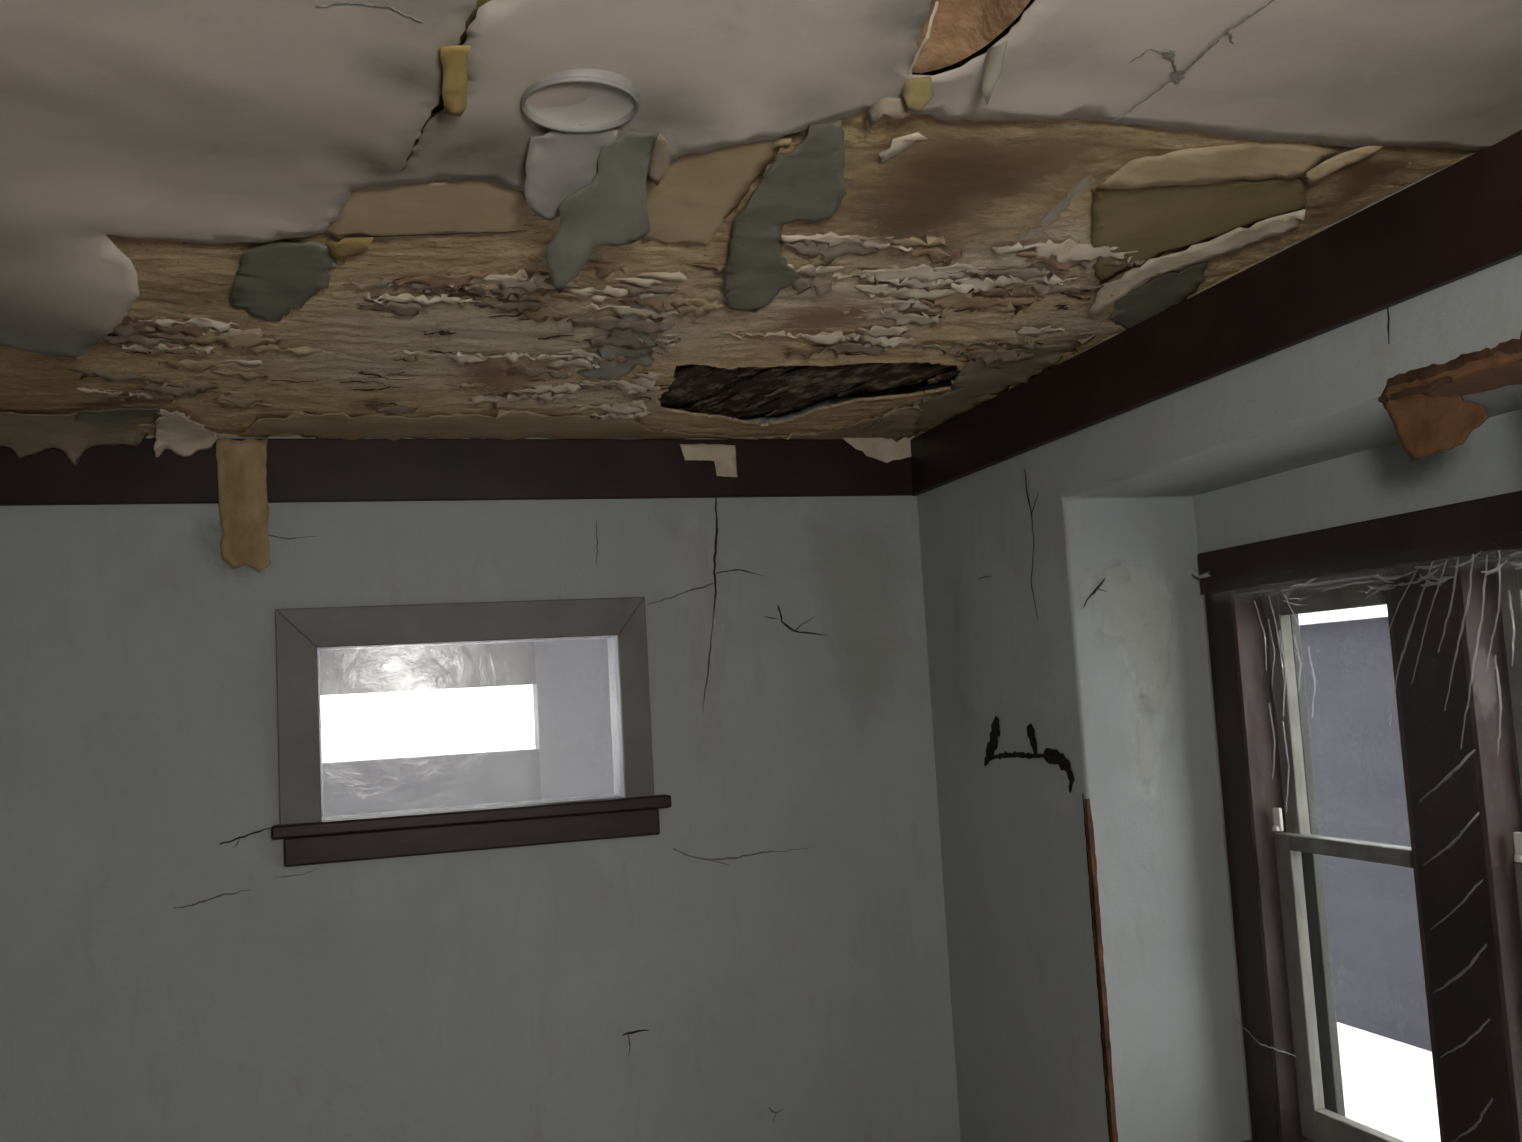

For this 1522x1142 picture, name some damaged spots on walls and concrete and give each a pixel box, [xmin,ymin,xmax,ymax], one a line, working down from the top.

crack [1112,0,1275,123]
damp [855,136,1092,256]
peeling [0,110,1479,442]
spalling [1378,339,1522,461]
crack [647,498,822,711]
crack [673,848,808,866]